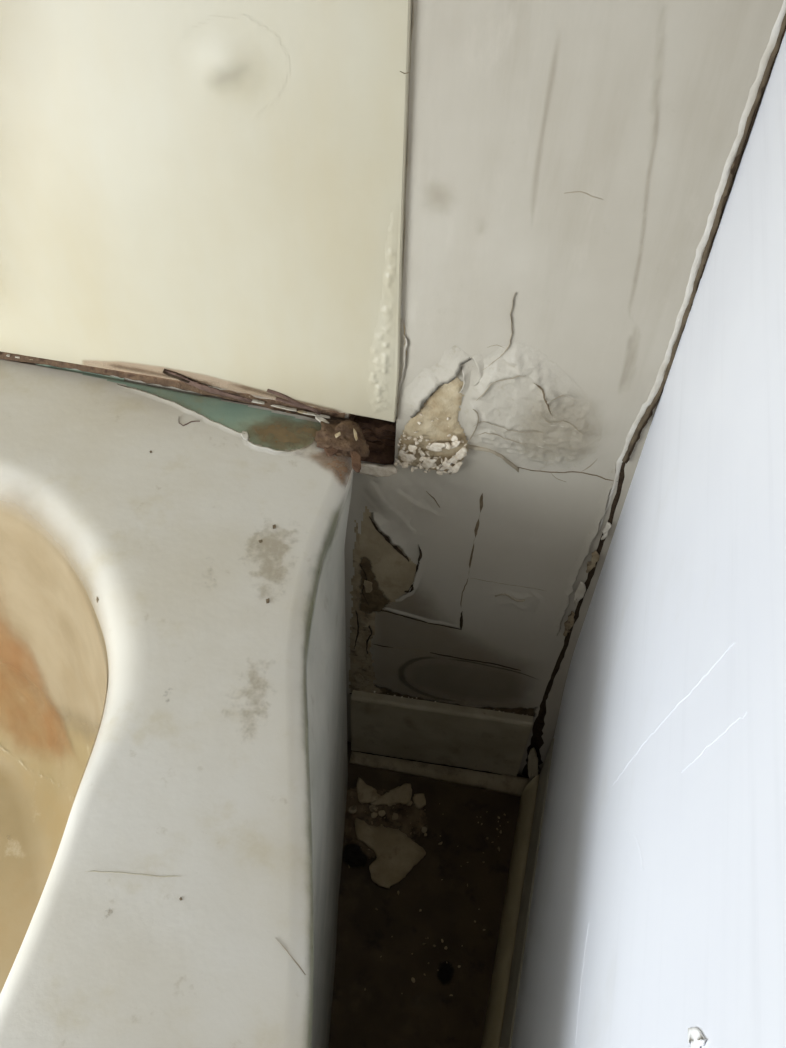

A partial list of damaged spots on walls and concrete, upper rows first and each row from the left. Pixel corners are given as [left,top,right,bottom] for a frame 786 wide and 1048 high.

spalling [349,305,484,475]
crack [468,13,786,777]
peeling [349,506,429,693]
crack [374,644,521,671]
crack [381,493,544,630]